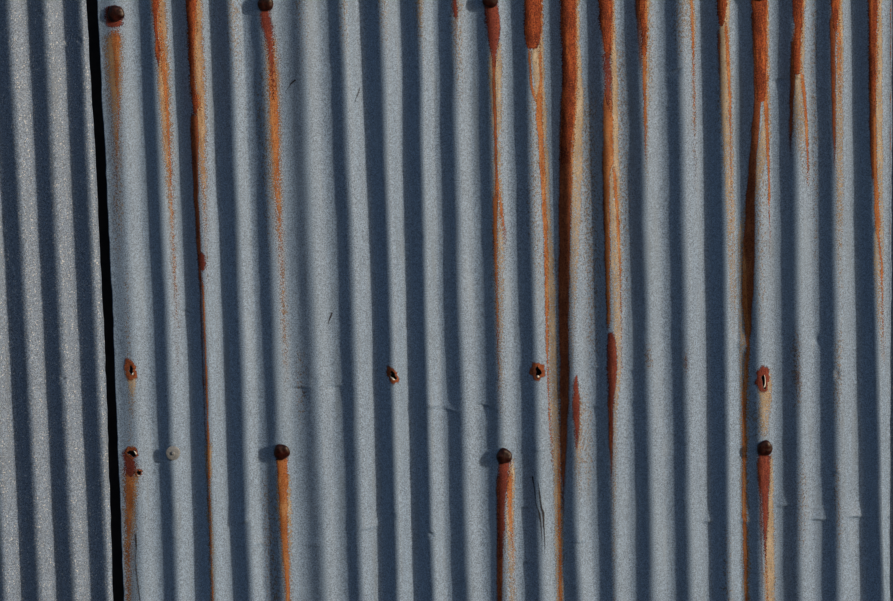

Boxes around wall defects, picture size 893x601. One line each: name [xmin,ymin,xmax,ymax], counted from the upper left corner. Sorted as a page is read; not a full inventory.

corrosion [150,0,179,314]
corrosion [186,0,215,601]
corrosion [259,11,289,390]
corrosion [484,5,506,413]
corrosion [523,0,585,601]
corrosion [598,0,623,599]
corrosion [635,0,651,197]
corrosion [716,0,776,601]
corrosion [789,0,811,186]
corrosion [867,0,892,362]
corrosion [274,457,294,601]
corrosion [496,459,517,601]